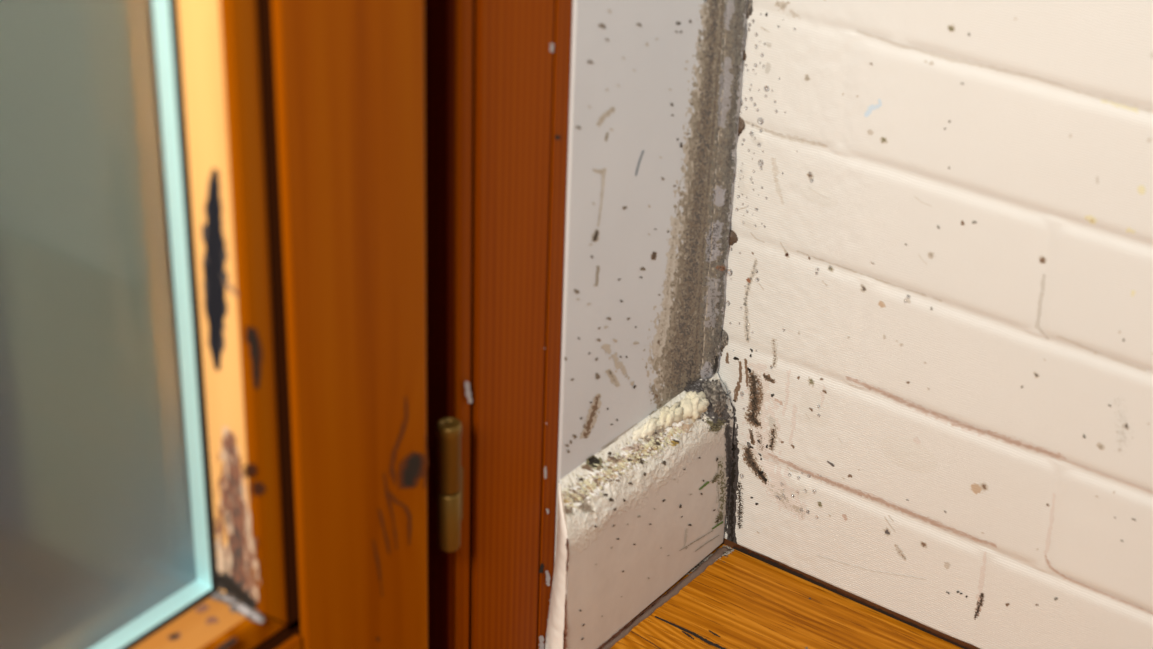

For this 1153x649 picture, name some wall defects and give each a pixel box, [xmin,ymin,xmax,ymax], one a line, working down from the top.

leakage [588,0,969,649]
leakage [565,393,618,453]
leakage [562,426,685,528]
leakage [971,483,988,494]
leakage [946,591,984,620]